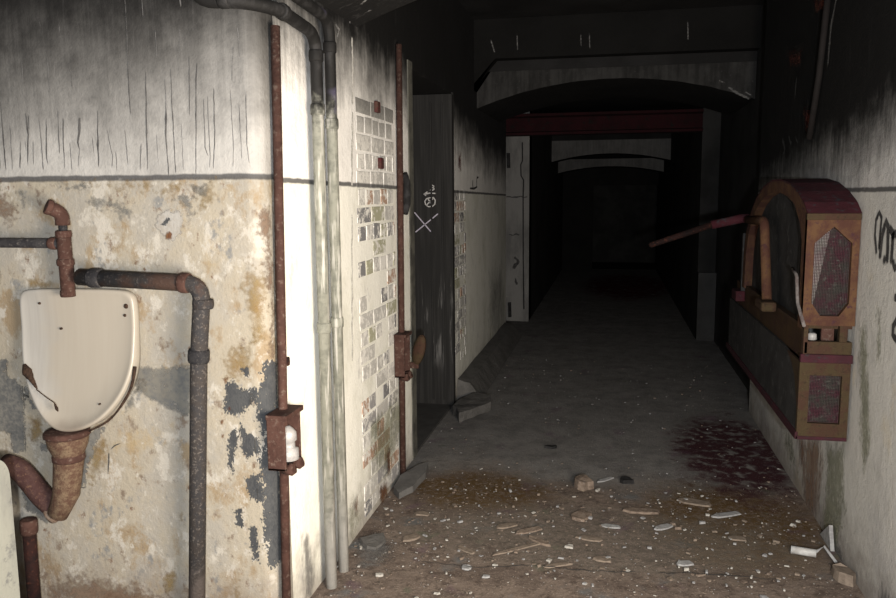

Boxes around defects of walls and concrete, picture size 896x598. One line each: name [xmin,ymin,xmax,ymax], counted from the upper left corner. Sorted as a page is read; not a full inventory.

damp [0,103,48,169]
damp [58,118,81,169]
damp [92,112,128,167]
damp [140,70,184,174]
damp [189,66,215,168]
damp [230,92,249,162]
damp [249,276,263,338]
peeling [223,359,281,570]
damp [49,577,153,598]